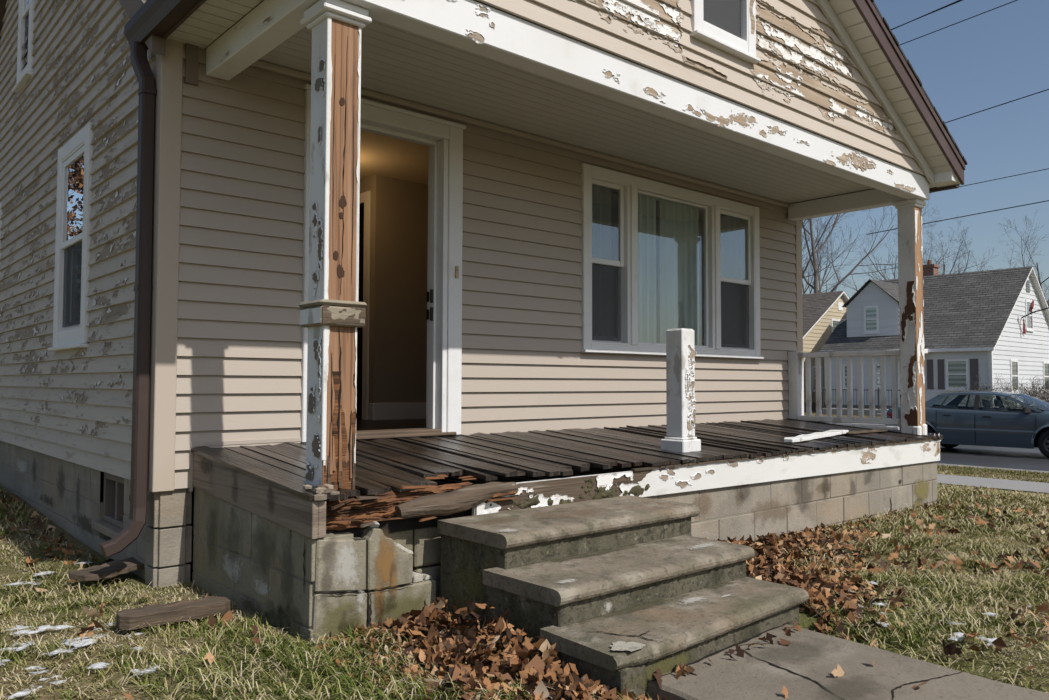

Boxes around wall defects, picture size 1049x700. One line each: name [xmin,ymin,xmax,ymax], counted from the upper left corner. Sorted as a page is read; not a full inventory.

peeling [314,51,332,146]
peeling [465,3,495,44]
peeling [572,0,728,80]
peeling [643,86,666,103]
peeling [683,103,811,146]
peeling [750,0,900,135]
peeling [0,0,139,436]
peeling [311,200,329,297]
peeling [899,210,925,426]
peeling [305,326,330,483]
peeling [475,467,716,515]
water stain [338,546,356,583]